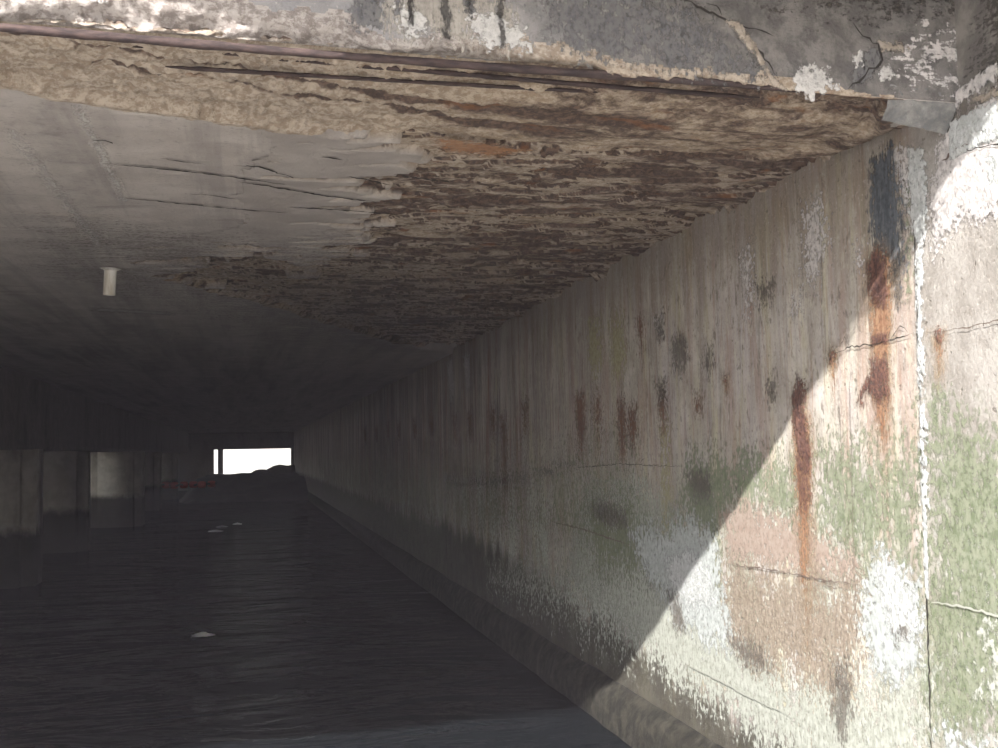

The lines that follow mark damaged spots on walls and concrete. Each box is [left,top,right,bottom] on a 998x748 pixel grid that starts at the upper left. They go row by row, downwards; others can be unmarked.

water stain [345,0,765,89]
crack [684,0,788,91]
water stain [793,62,840,102]
crack [848,23,910,89]
spalling [0,0,908,347]
corrosion [616,398,639,471]
corrosion [790,373,814,600]
corrosion [856,244,893,450]
water stain [852,139,930,600]
crack [834,220,998,358]
water stain [827,653,857,748]
crack [926,598,998,748]